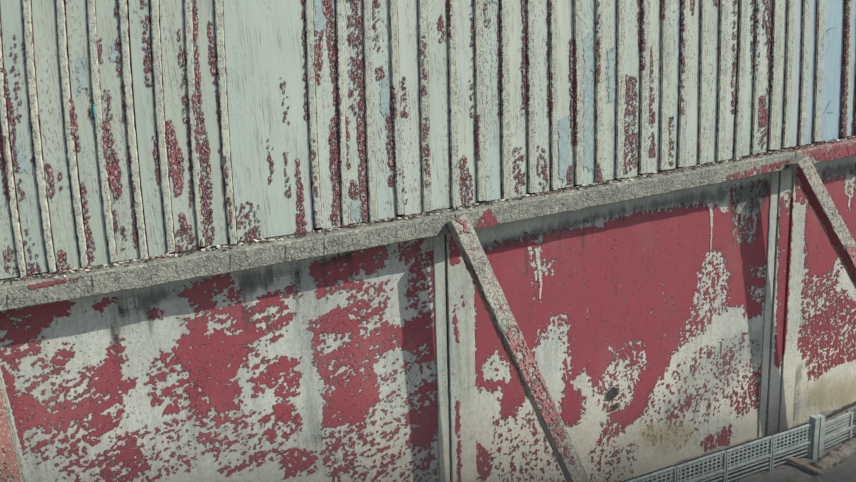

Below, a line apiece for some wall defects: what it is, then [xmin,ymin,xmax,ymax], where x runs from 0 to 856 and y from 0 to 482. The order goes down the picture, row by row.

peeling [0,34,63,201]
peeling [81,182,96,266]
peeling [69,0,139,250]
peeling [140,0,153,87]
peeling [152,0,261,253]
peeling [267,139,318,234]
peeling [301,0,408,226]
peeling [420,36,428,96]
peeling [423,117,431,187]
peeling [437,0,452,43]
peeling [447,0,856,458]
peeling [0,229,438,482]